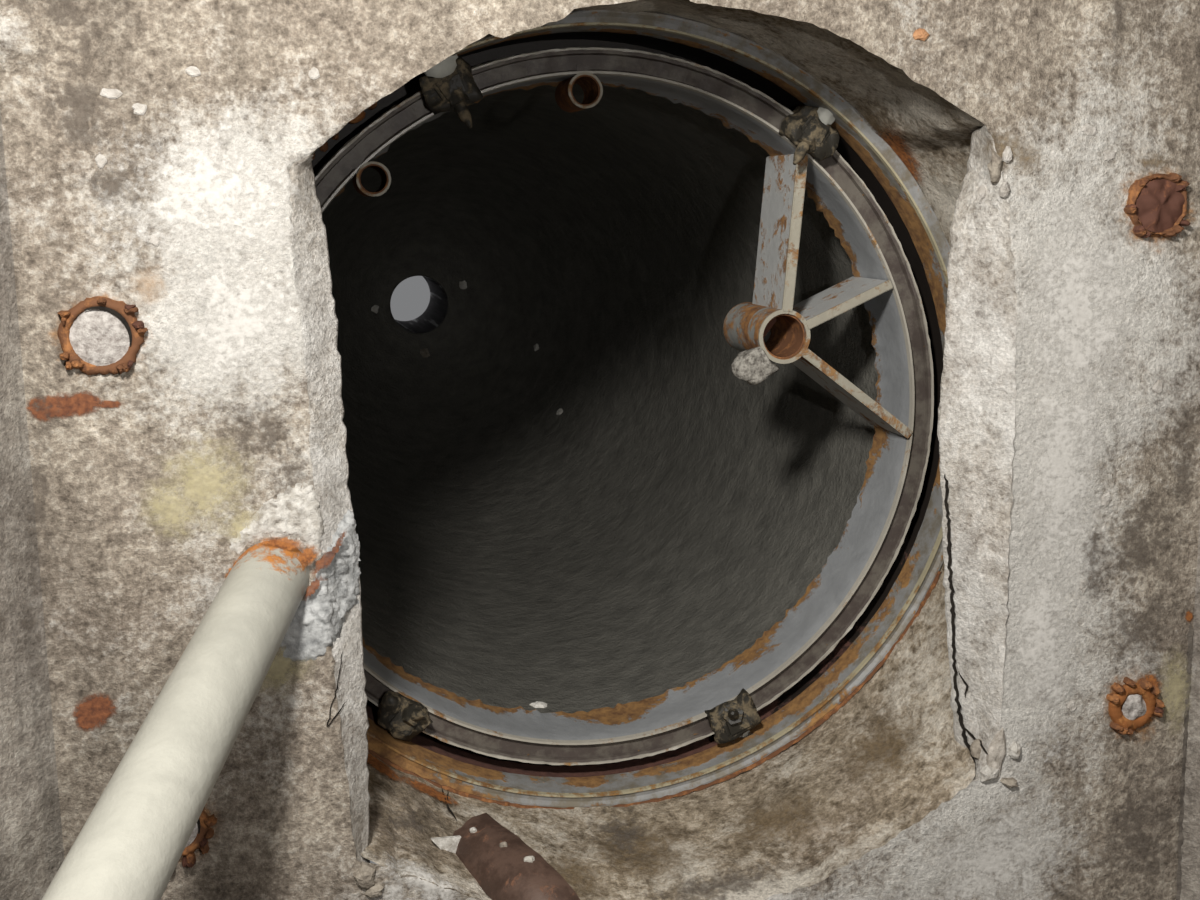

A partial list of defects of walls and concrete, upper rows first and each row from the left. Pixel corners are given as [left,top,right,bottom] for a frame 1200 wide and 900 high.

corrosion [1123,180,1191,240]
corrosion [58,310,71,326]
corrosion [124,304,148,334]
corrosion [53,349,85,370]
corrosion [116,360,134,374]
corrosion [26,392,121,421]
corrosion [262,531,347,597]
crack [944,475,988,763]
corrosion [73,694,116,730]
corrosion [1106,667,1184,735]
corrosion [180,809,217,868]